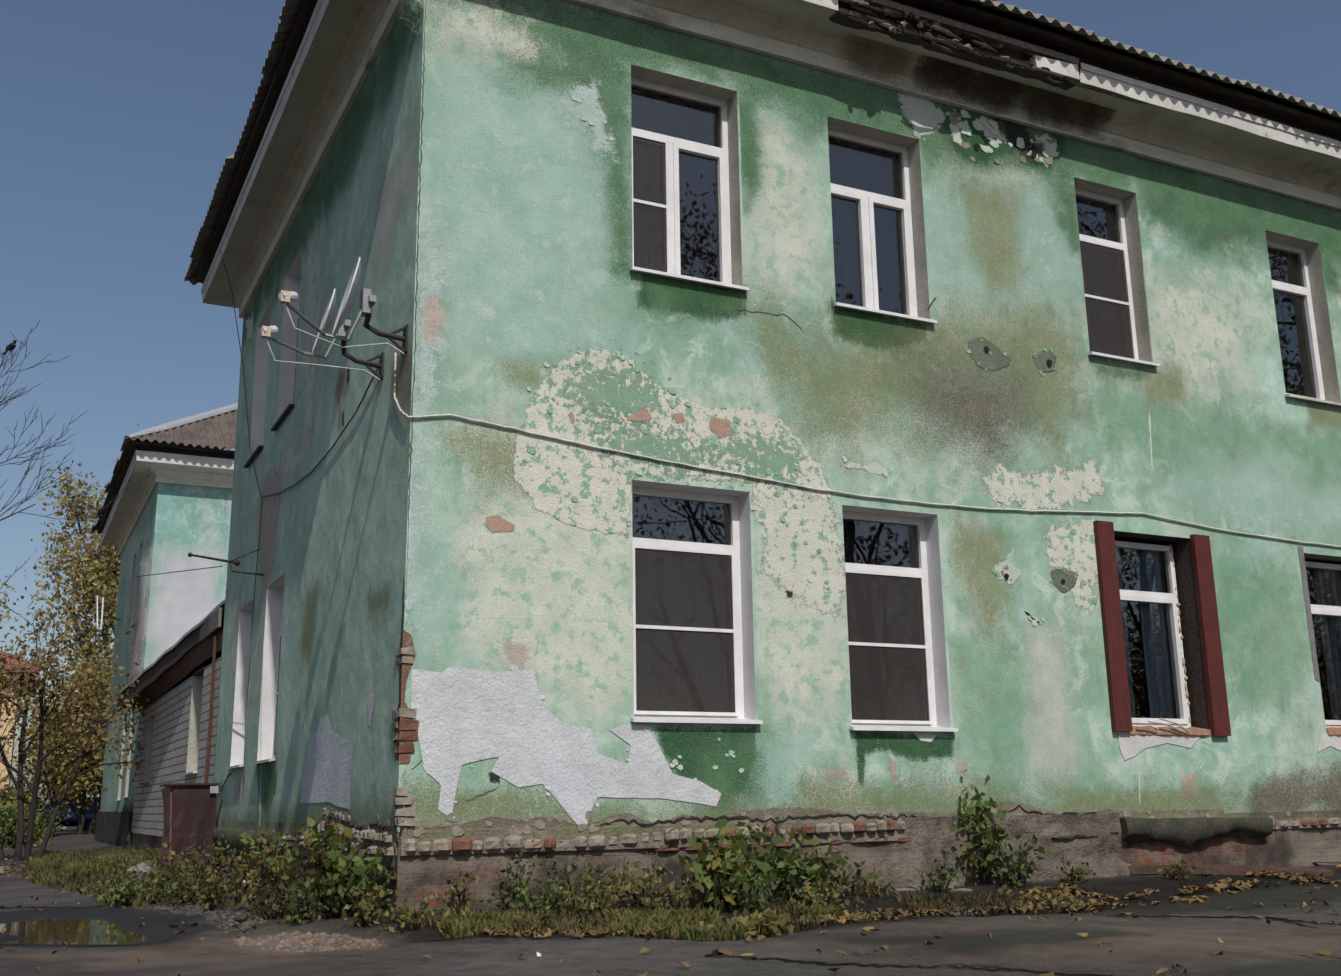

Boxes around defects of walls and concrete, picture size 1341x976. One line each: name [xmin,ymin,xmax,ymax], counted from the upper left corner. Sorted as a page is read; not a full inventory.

spalling [897,92,1068,177]
spalling [967,337,1010,371]
spalling [1032,348,1057,376]
peeling [391,218,462,764]
peeling [512,343,846,623]
peeling [981,459,1106,613]
spalling [312,790,958,849]
leakage [220,715,1341,851]
spalling [1053,832,1119,840]
spalling [974,801,1210,818]